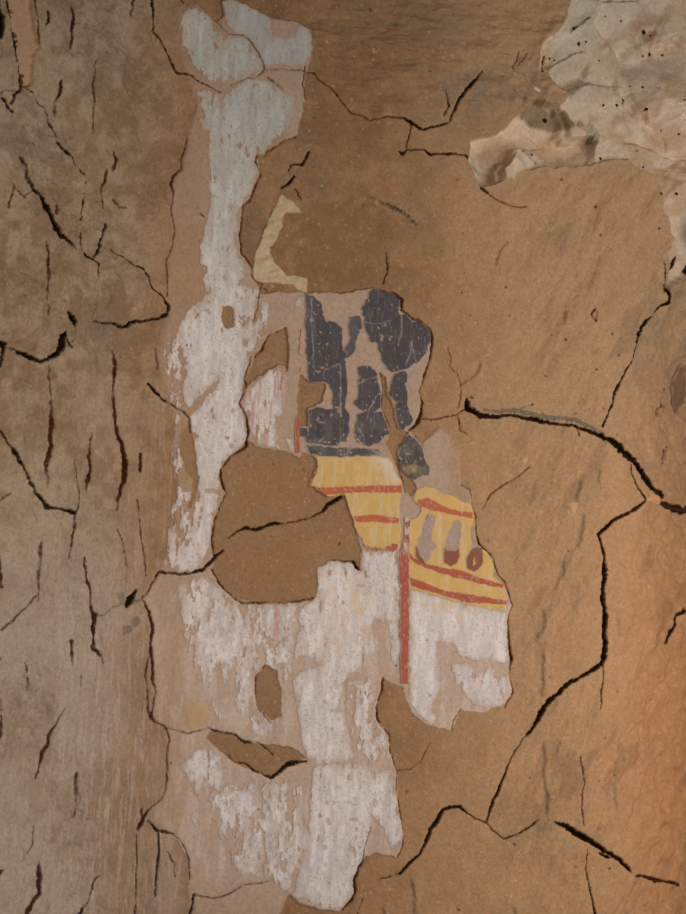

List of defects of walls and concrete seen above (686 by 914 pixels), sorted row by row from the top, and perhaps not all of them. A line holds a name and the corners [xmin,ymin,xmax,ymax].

crack [0,1,341,914]
crack [130,0,482,159]
flaking render [144,0,512,914]
crack [480,187,526,208]
crack [341,252,686,914]